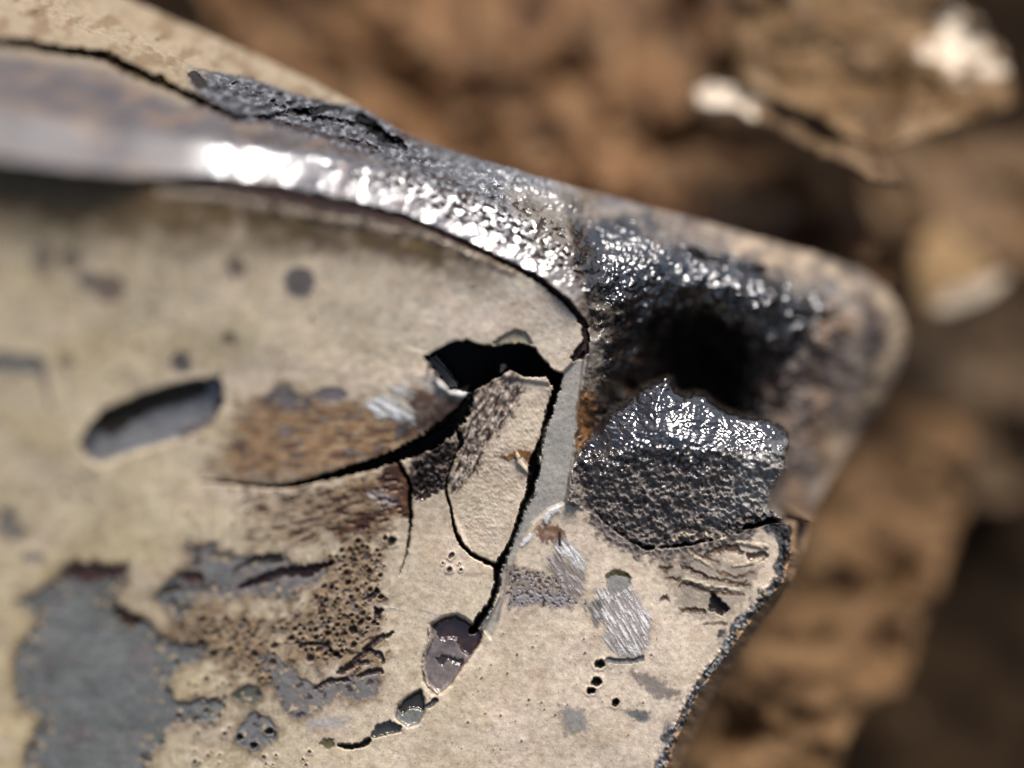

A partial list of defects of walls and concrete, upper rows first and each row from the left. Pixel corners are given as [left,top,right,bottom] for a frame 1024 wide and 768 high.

crack [0,37,408,150]
spalling [81,378,223,465]
crack [136,174,590,634]
corrosion [156,387,462,688]
peeling [497,489,577,607]
peeling [11,529,397,768]
crack [337,738,371,749]
crack [425,698,438,708]